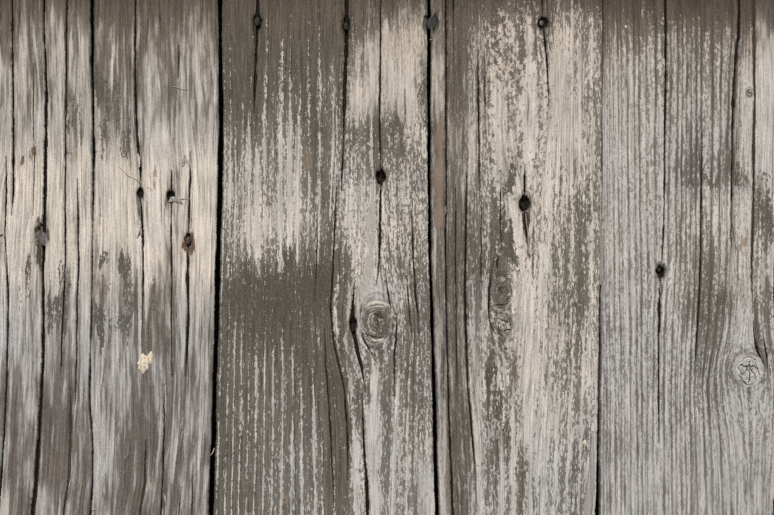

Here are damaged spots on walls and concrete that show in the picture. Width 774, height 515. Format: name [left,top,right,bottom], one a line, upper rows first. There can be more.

crack [314,0,374,515]
crack [376,0,384,165]
crack [376,190,419,380]
peeling [433,111,444,230]
crack [522,170,530,253]
crack [657,0,667,443]
crack [730,0,768,373]